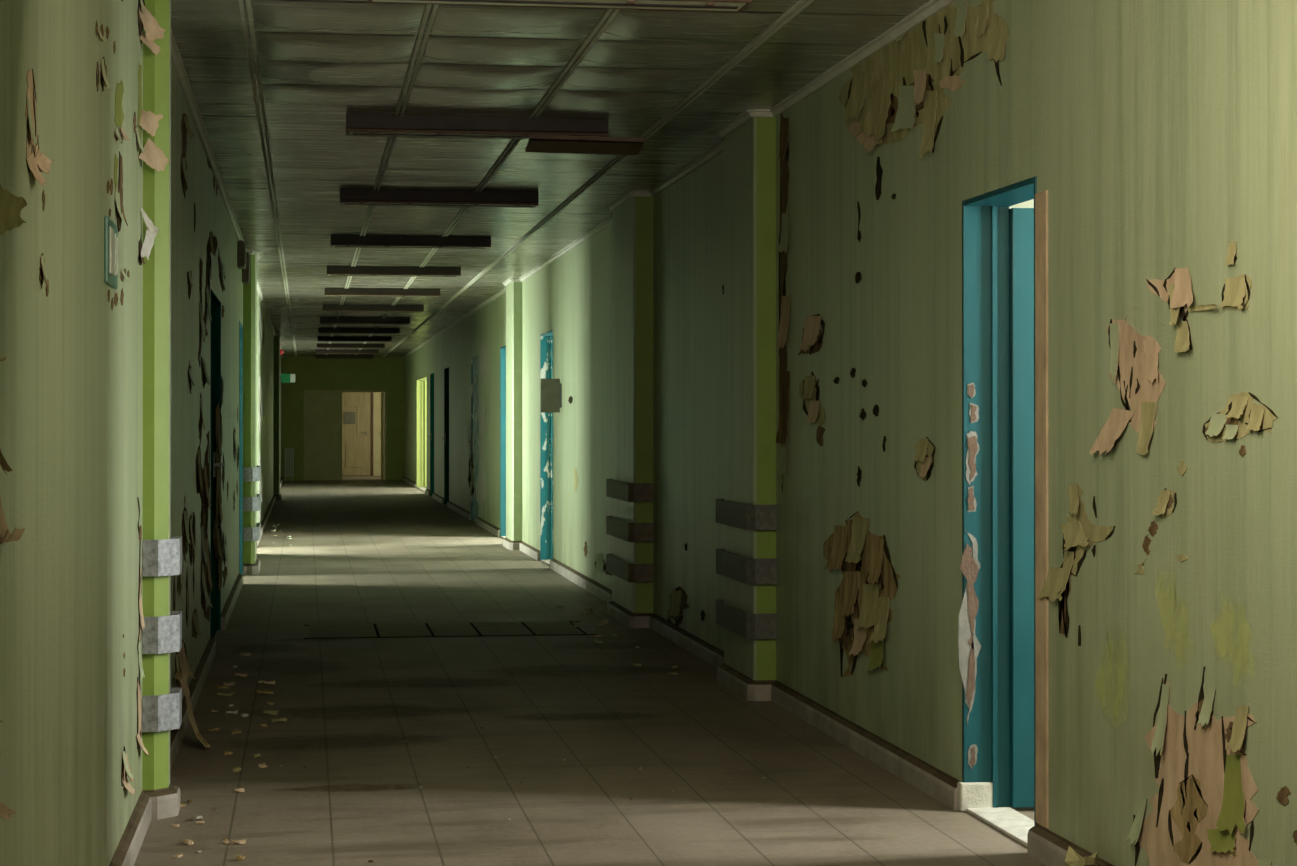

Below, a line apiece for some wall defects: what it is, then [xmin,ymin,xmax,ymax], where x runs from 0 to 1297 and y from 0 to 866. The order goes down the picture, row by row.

peeling [0,69,55,236]
peeling [95,21,195,311]
peeling [838,0,1009,158]
peeling [170,231,239,688]
peeling [966,382,980,512]
peeling [1089,241,1252,456]
peeling [1202,392,1278,458]
peeling [121,497,148,795]
peeling [823,511,900,677]
peeling [958,529,981,724]
peeling [1038,482,1115,646]
peeling [1124,666,1272,866]